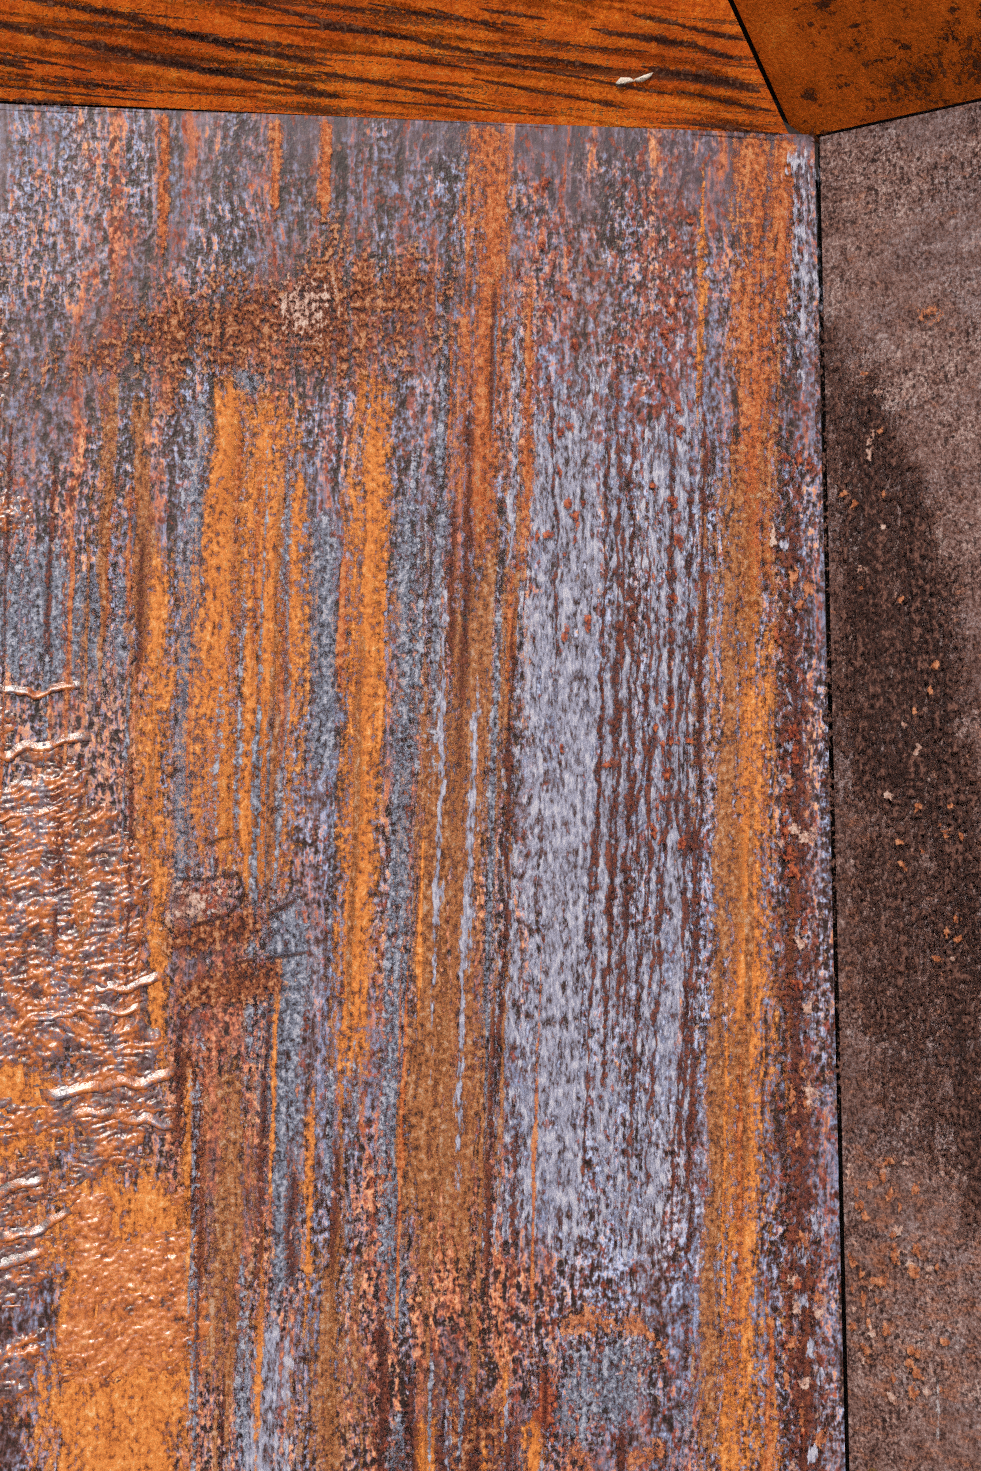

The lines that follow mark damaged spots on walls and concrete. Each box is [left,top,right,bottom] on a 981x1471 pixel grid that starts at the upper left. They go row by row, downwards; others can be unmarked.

corrosion [0,114,595,1471]
corrosion [649,133,834,1471]
leakage [813,309,981,1243]
corrosion [932,915,962,962]
corrosion [559,1302,668,1361]
corrosion [626,1438,671,1471]
corrosion [846,1157,939,1364]
corrosion [887,1344,945,1404]